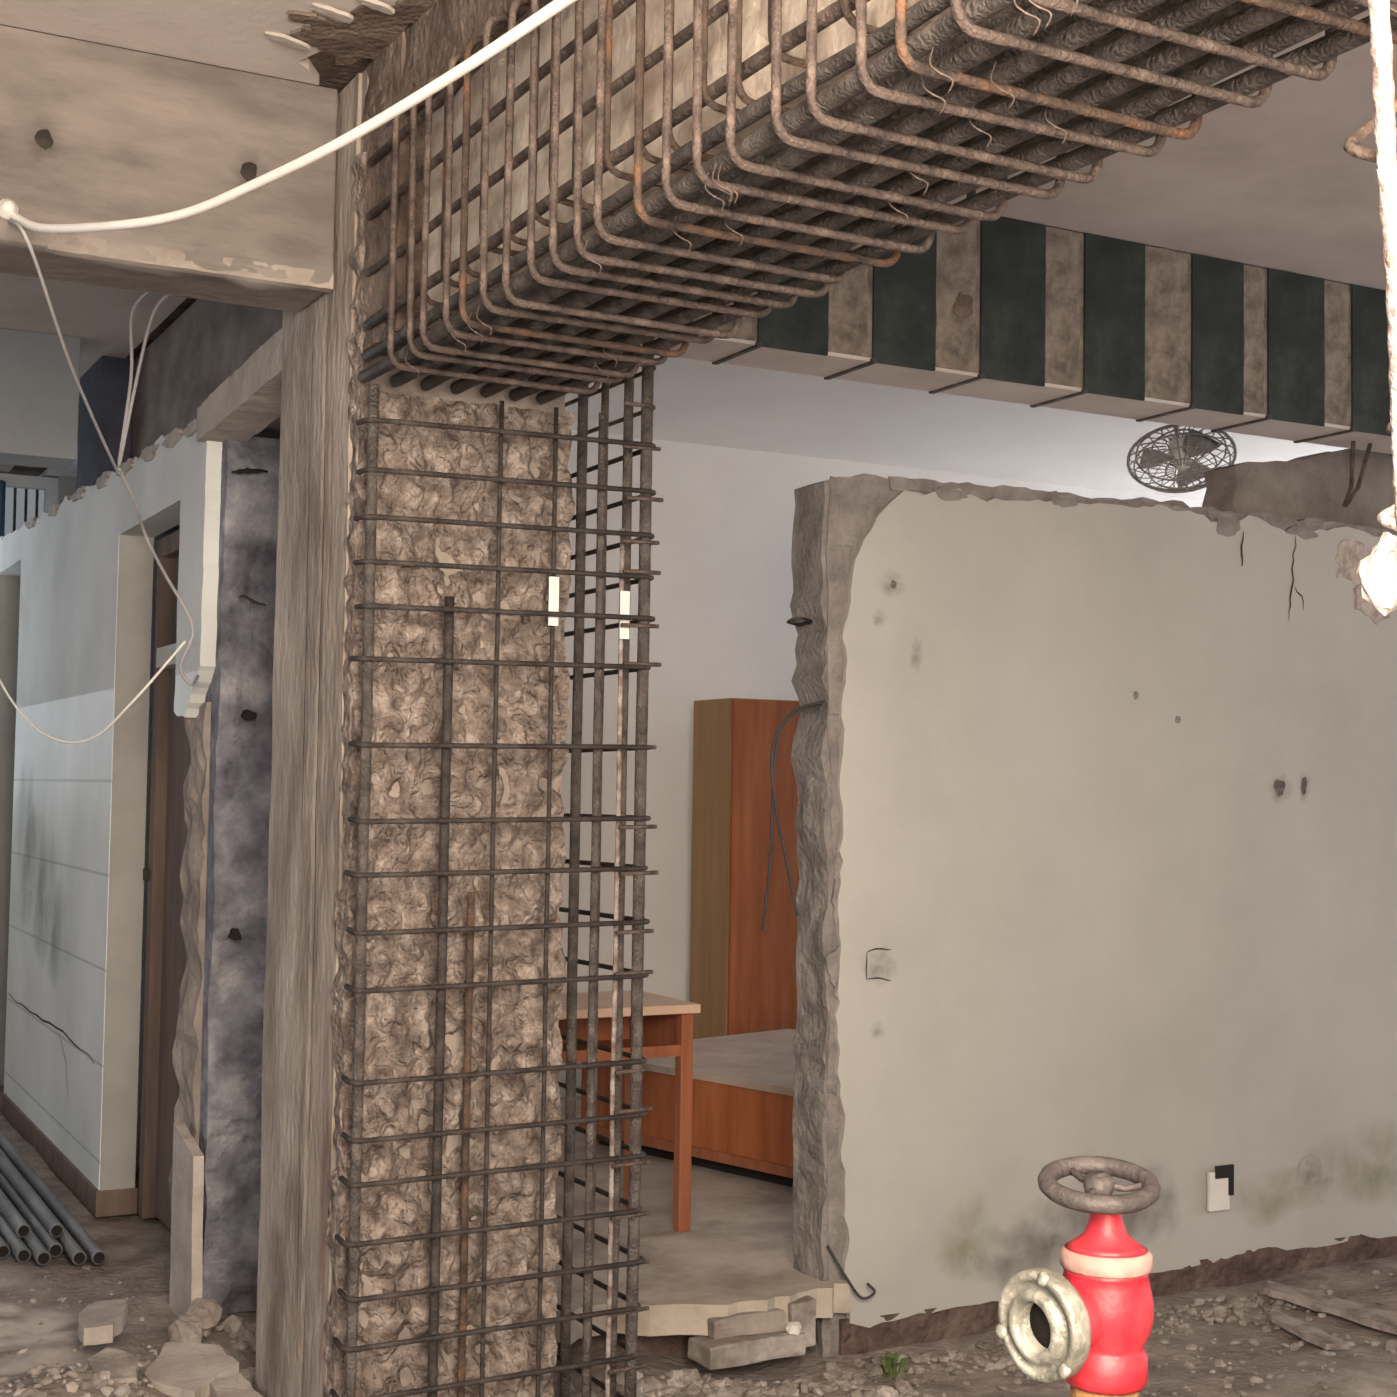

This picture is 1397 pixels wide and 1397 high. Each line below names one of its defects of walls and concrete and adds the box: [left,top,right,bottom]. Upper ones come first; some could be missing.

flaking render [264,0,514,132]
spalling [240,162,257,182]
spalling [45,233,334,293]
spalling [828,244,868,357]
spalling [935,219,978,372]
spalling [1045,226,1081,387]
spalling [1145,245,1189,403]
spalling [1244,265,1265,414]
spalling [1324,280,1349,426]
flaking render [25,419,197,529]
spalling [323,152,575,1397]
flaking render [792,476,1397,1281]